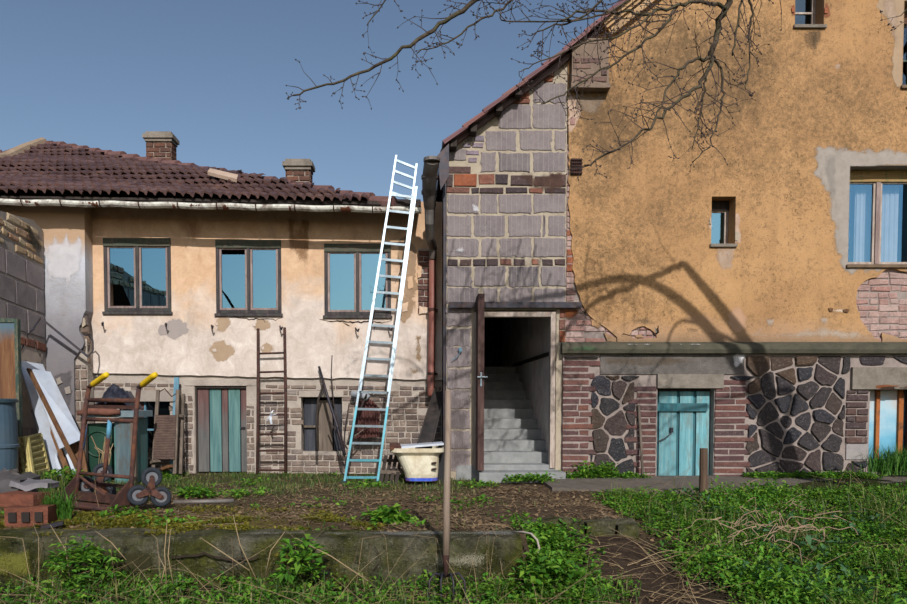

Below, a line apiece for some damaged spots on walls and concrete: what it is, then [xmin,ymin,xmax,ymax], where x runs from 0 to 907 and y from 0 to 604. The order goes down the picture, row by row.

flaking render [566,95,582,132]
leakage [285,219,312,271]
flaking render [387,218,429,323]
flaking render [565,144,659,342]
flaking render [158,319,189,340]
flaking render [209,316,235,362]
flaking render [828,268,907,342]